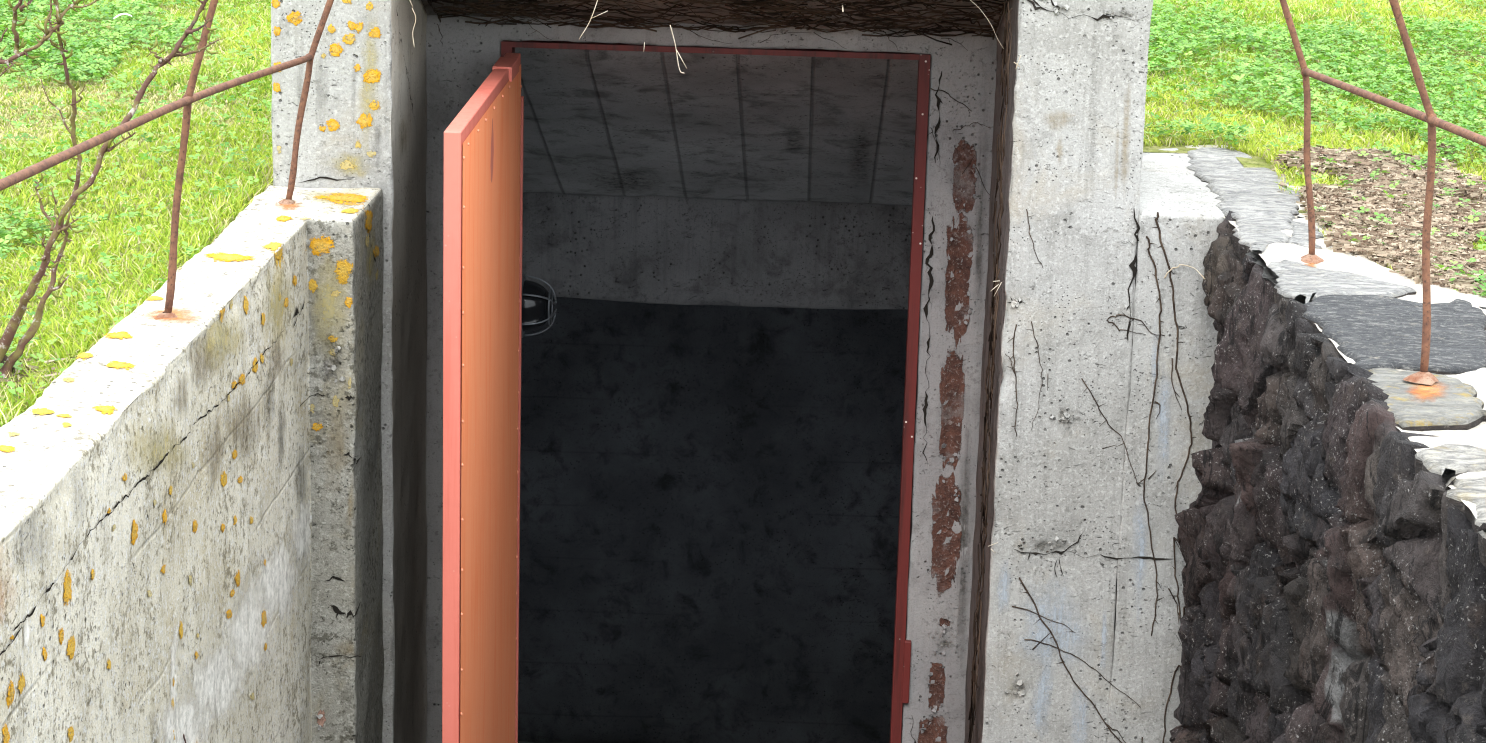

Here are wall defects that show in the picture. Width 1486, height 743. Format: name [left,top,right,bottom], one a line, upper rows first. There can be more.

crack [1027,0,1146,21]
crack [0,304,304,655]
crack [1012,534,1170,577]